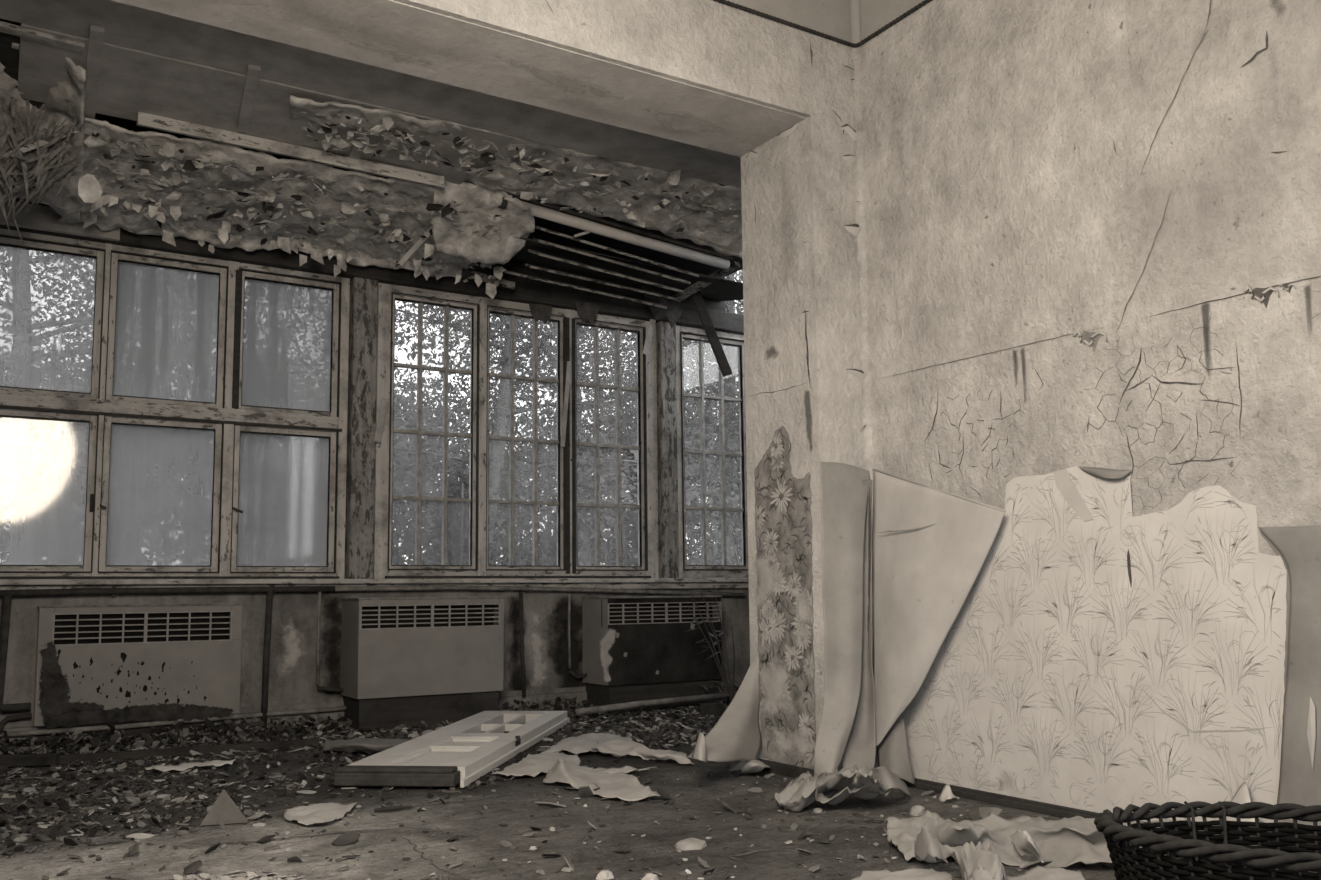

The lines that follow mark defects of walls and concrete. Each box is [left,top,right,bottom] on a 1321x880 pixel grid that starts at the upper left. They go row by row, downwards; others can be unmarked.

crack [1113,0,1212,173]
peeling [84,114,738,286]
crack [922,370,1043,497]
crack [1081,190,1243,508]